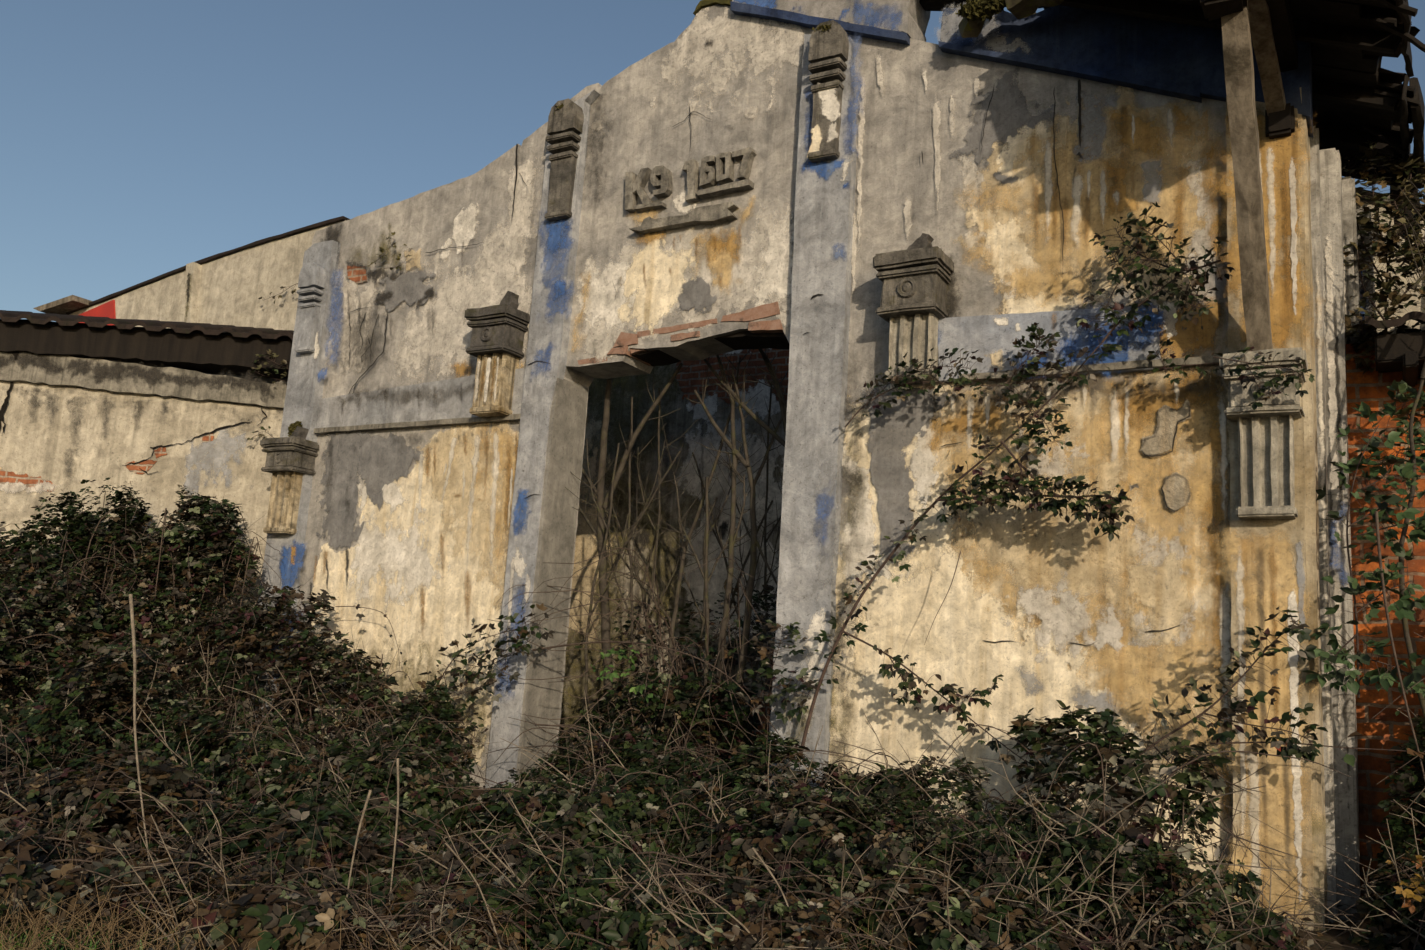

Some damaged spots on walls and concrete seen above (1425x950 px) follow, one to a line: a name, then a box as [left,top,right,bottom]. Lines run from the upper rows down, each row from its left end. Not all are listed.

peeling [937,3,1030,53]
peeling [802,0,902,188]
water stain [1072,171,1119,242]
peeling [314,157,794,384]
crack [0,352,19,433]
crack [123,406,267,474]
water stain [935,396,989,444]
peeling [803,68,1233,895]
water stain [1043,379,1129,462]
water stain [1218,400,1228,509]
peeling [274,424,530,768]
water stain [1220,235,1369,918]